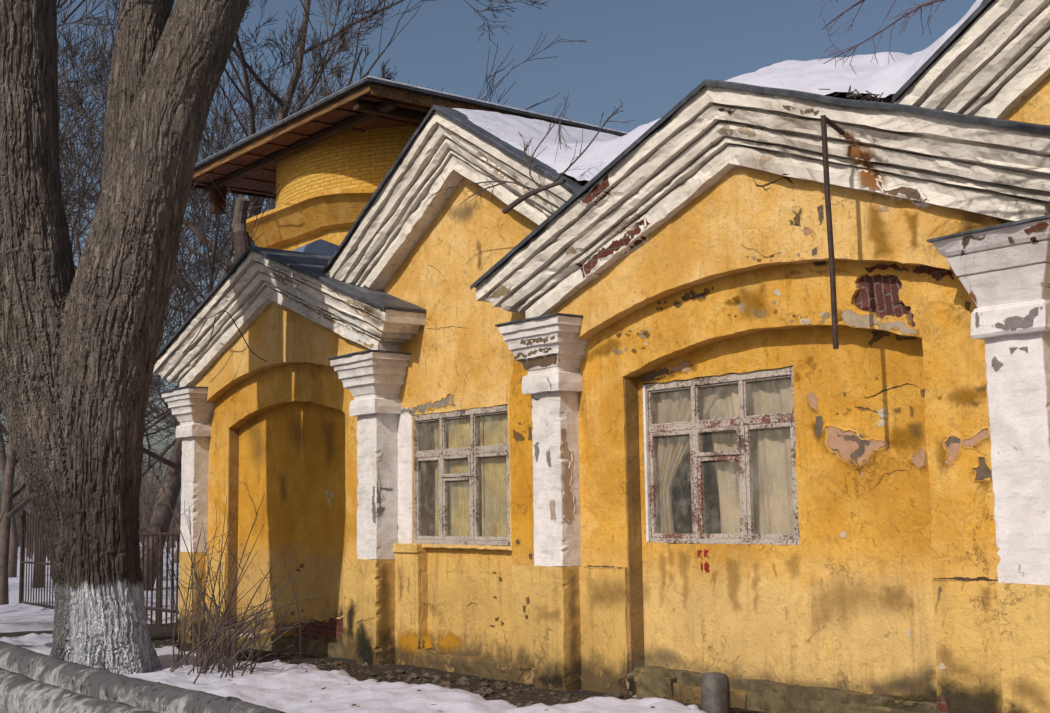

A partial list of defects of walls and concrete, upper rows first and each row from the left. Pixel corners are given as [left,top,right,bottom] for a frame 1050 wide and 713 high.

corrosion [843,133,884,194]
flaking render [559,212,650,278]
flaking render [790,264,954,346]
peeling [975,306,1043,331]
flaking render [514,335,560,370]
peeling [991,346,1028,371]
peeling [372,453,393,523]
peeling [513,422,576,525]
peeling [807,391,913,478]
peeling [939,422,992,486]
water stain [381,570,460,652]
crack [935,575,998,583]